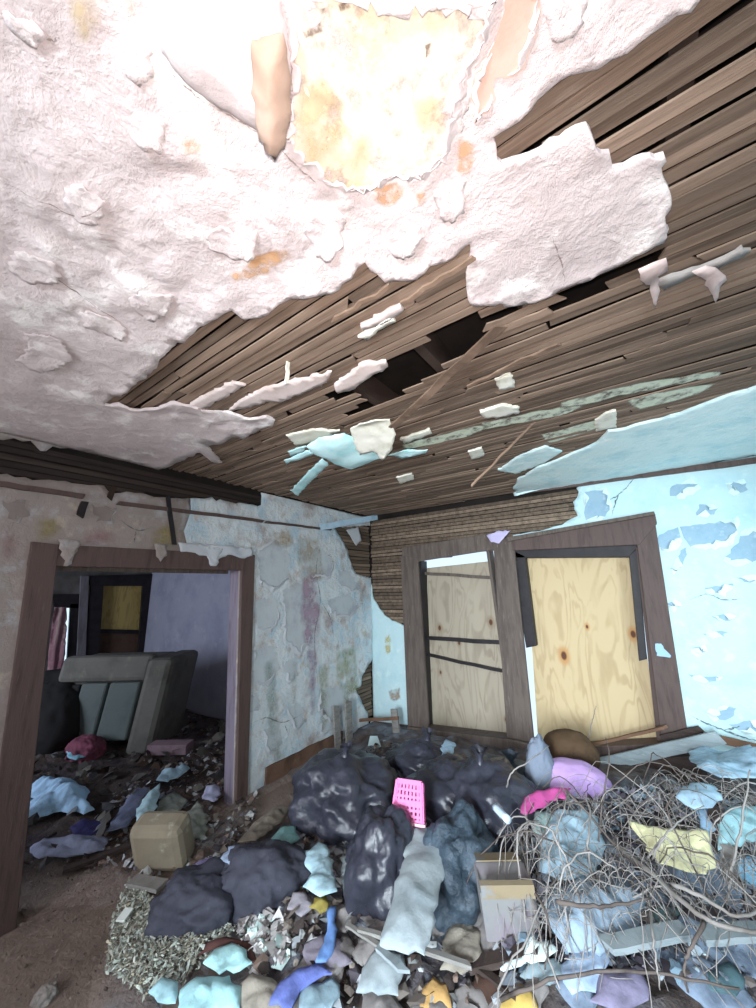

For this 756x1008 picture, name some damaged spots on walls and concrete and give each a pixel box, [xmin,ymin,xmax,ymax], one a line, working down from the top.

flaking render [0,0,756,623]
peeling [317,661,373,736]
peeling [706,705,756,737]